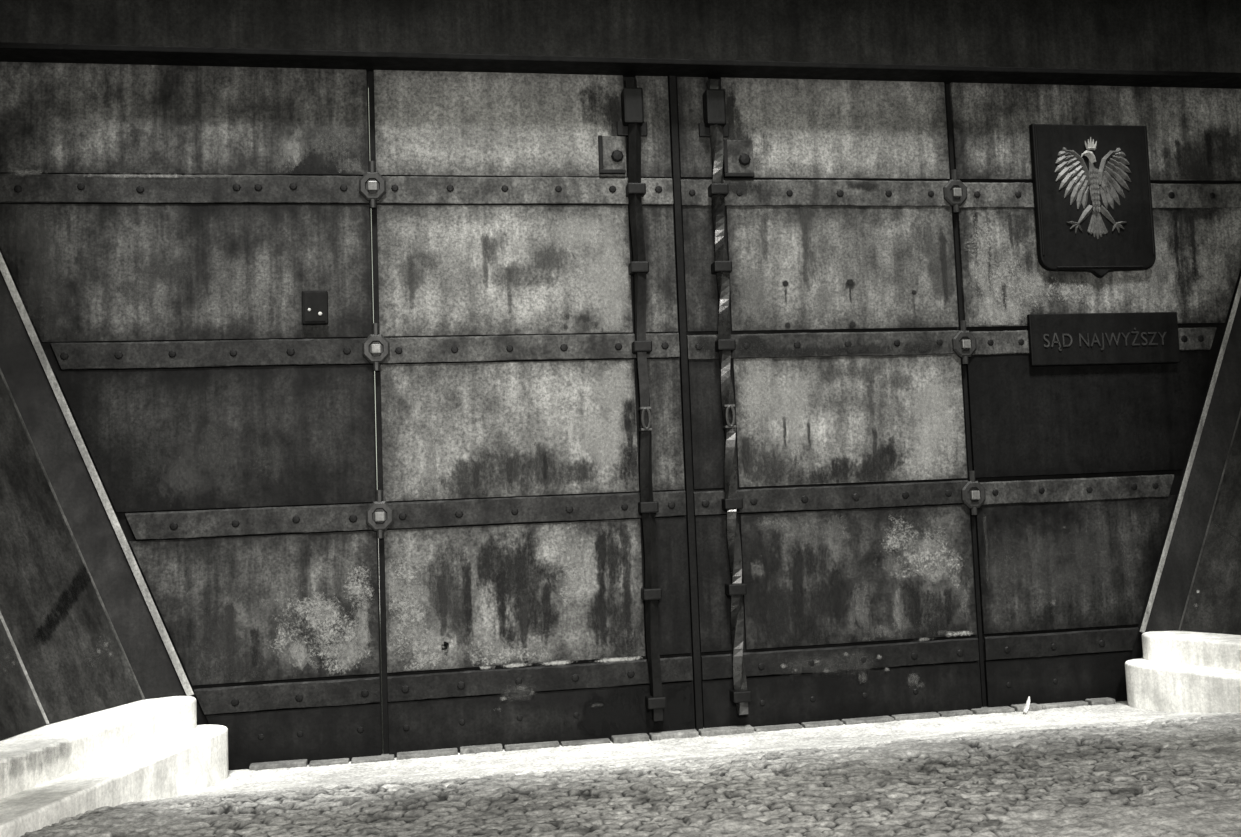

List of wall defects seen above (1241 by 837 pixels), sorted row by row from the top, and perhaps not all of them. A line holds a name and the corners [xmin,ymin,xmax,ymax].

leakage [482,237,562,305]
leakage [421,430,593,496]
leakage [742,438,796,484]
leakage [810,430,903,483]
leakage [429,532,558,669]
leakage [588,521,641,662]
leakage [746,532,853,648]